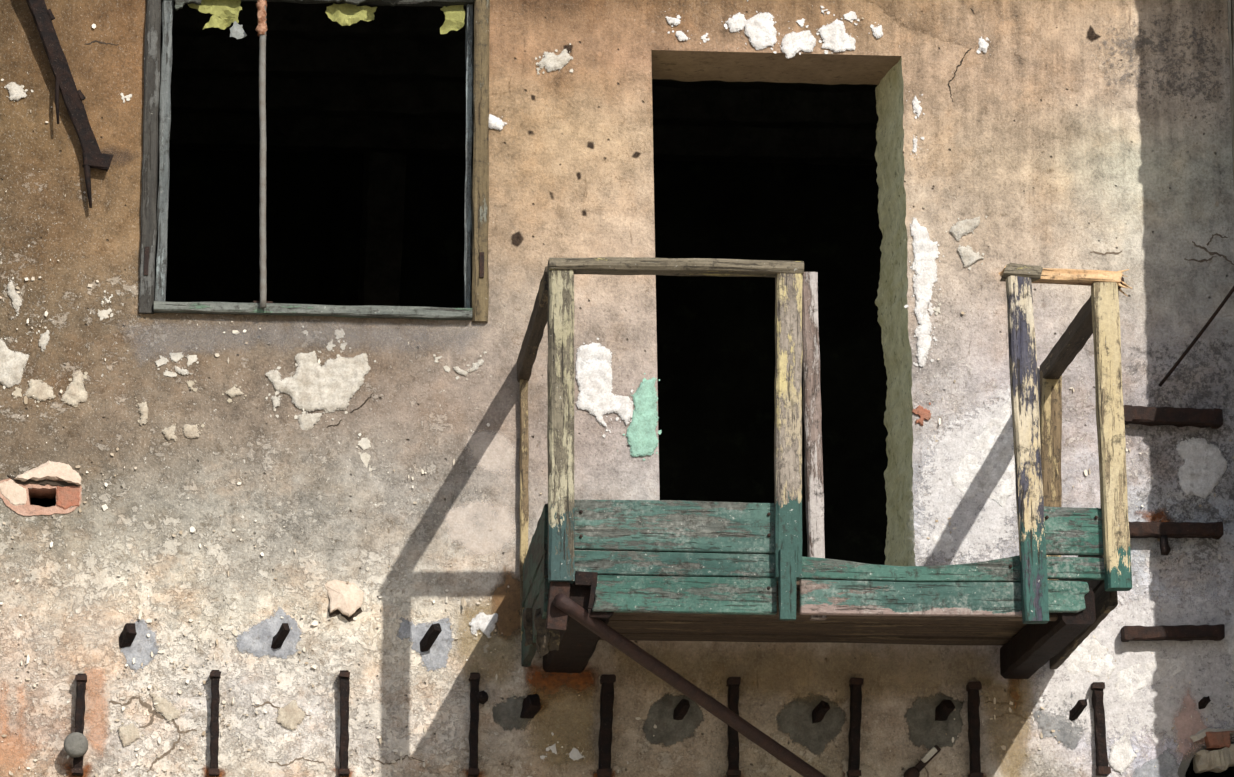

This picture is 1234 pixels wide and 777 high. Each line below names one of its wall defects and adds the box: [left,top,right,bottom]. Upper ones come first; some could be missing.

peeling [665,11,710,44]
peeling [722,0,883,59]
crack [948,48,972,102]
crack [1090,248,1122,256]
crack [1184,233,1234,265]
peeling [904,205,987,372]
peeling [0,276,89,417]
peeling [265,325,376,430]
peeling [576,338,662,461]
spalling [0,461,137,547]
peeling [1160,437,1234,507]
rust [526,666,597,712]